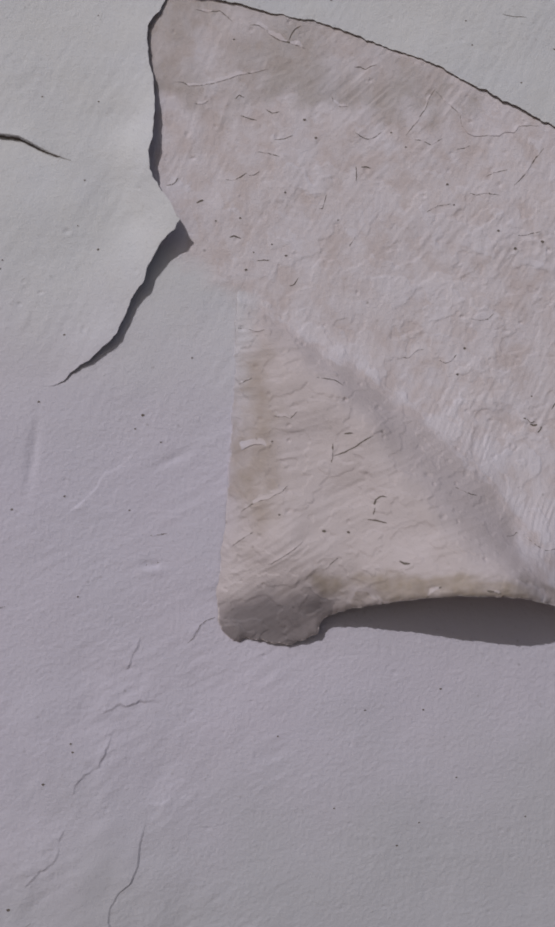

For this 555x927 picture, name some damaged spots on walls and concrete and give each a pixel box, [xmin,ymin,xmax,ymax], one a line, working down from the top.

crack [0,135,68,160]
peeling [5,0,555,645]
crack [188,617,213,643]